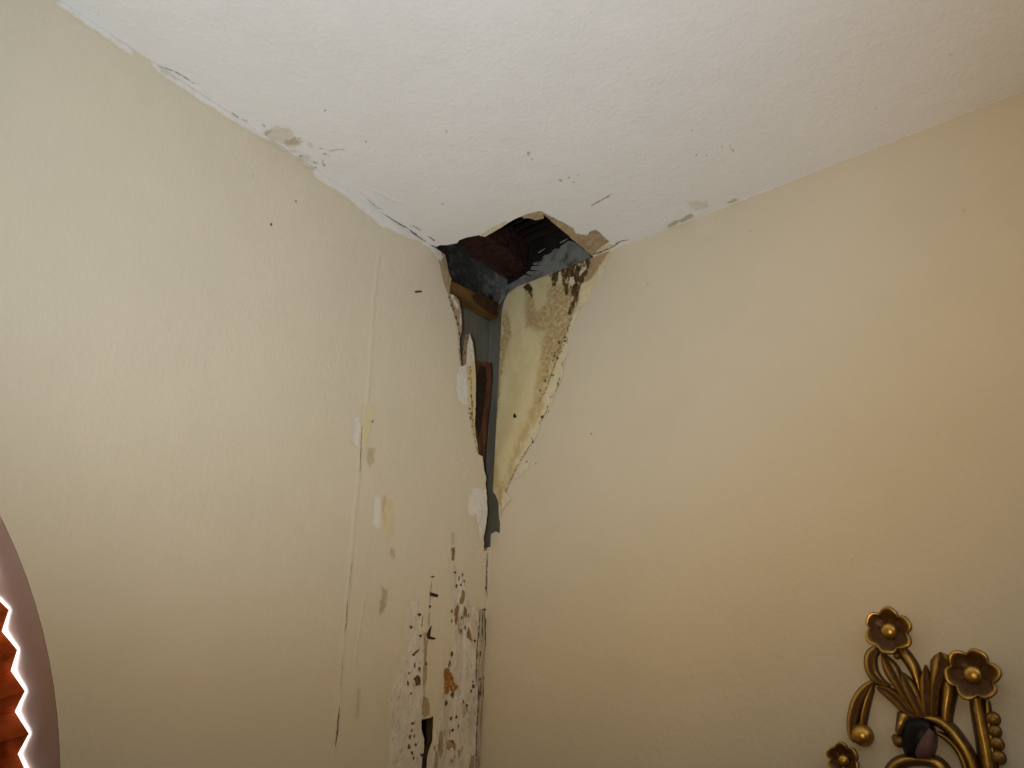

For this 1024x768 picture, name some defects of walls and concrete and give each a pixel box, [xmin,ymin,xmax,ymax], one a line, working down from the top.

peeling [262,124,344,168]
leakage [497,252,610,401]
peeling [457,452,488,552]
crack [335,562,353,747]
peeling [374,547,481,768]